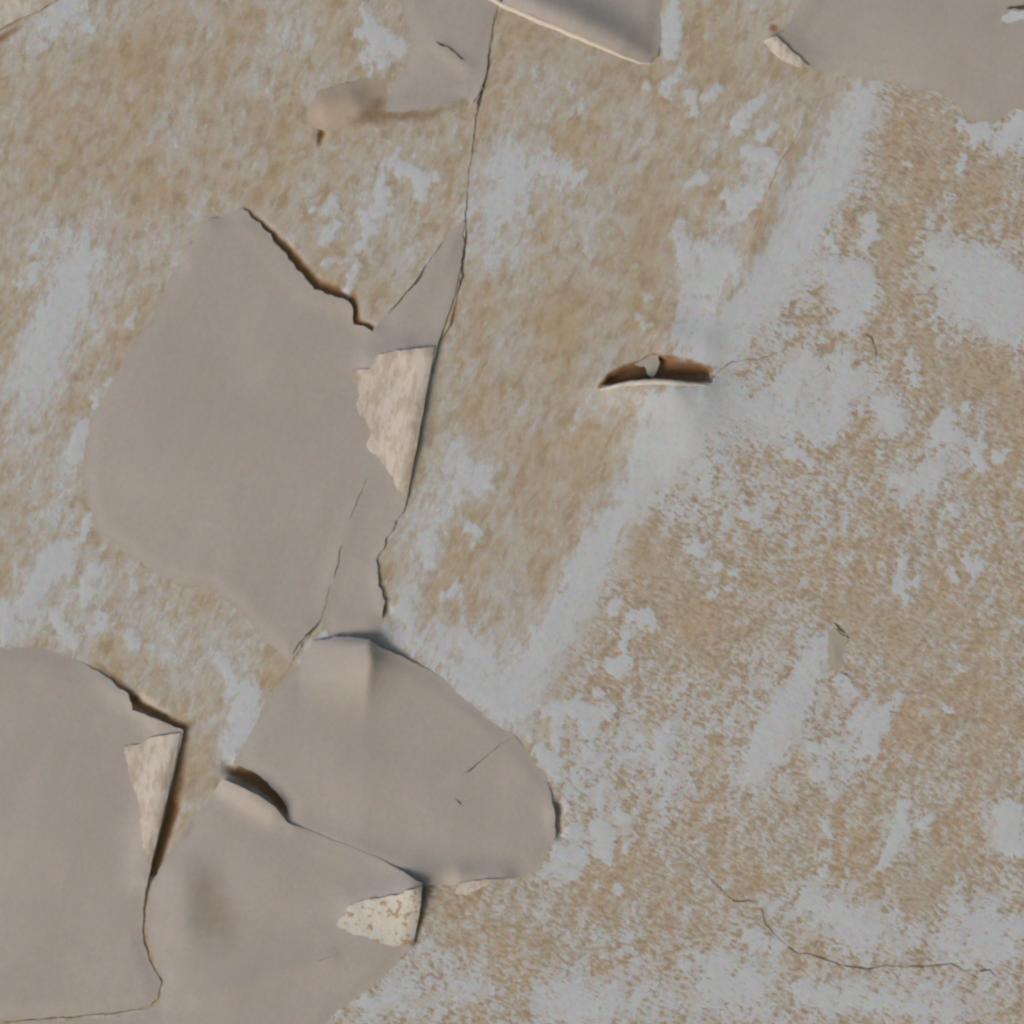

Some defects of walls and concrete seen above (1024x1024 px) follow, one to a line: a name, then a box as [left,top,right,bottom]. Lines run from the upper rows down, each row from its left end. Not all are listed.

crack [389,14,495,341]
peeling [348,0,730,122]
peeling [497,75,907,743]
peeling [0,133,633,1024]
crack [679,847,994,977]